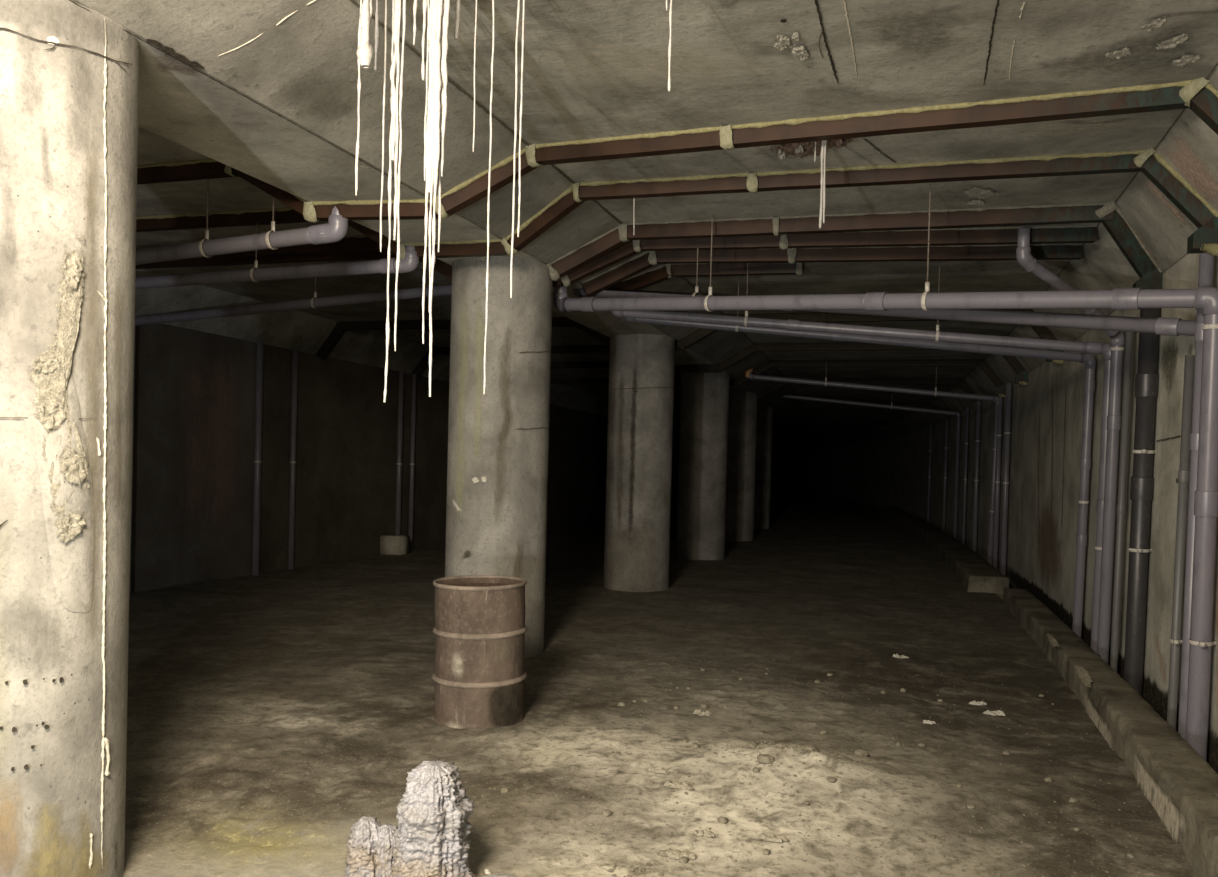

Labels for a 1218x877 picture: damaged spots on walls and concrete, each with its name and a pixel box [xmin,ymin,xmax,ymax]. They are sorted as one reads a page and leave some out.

crack [0,0,429,199]
crack [350,0,529,146]
crack [815,0,839,85]
crack [983,0,999,86]
crack [551,165,621,224]
damp [87,17,120,869]
damp [1009,571,1091,648]
damp [1108,646,1124,679]
damp [1142,673,1179,732]
damp [1207,729,1218,774]